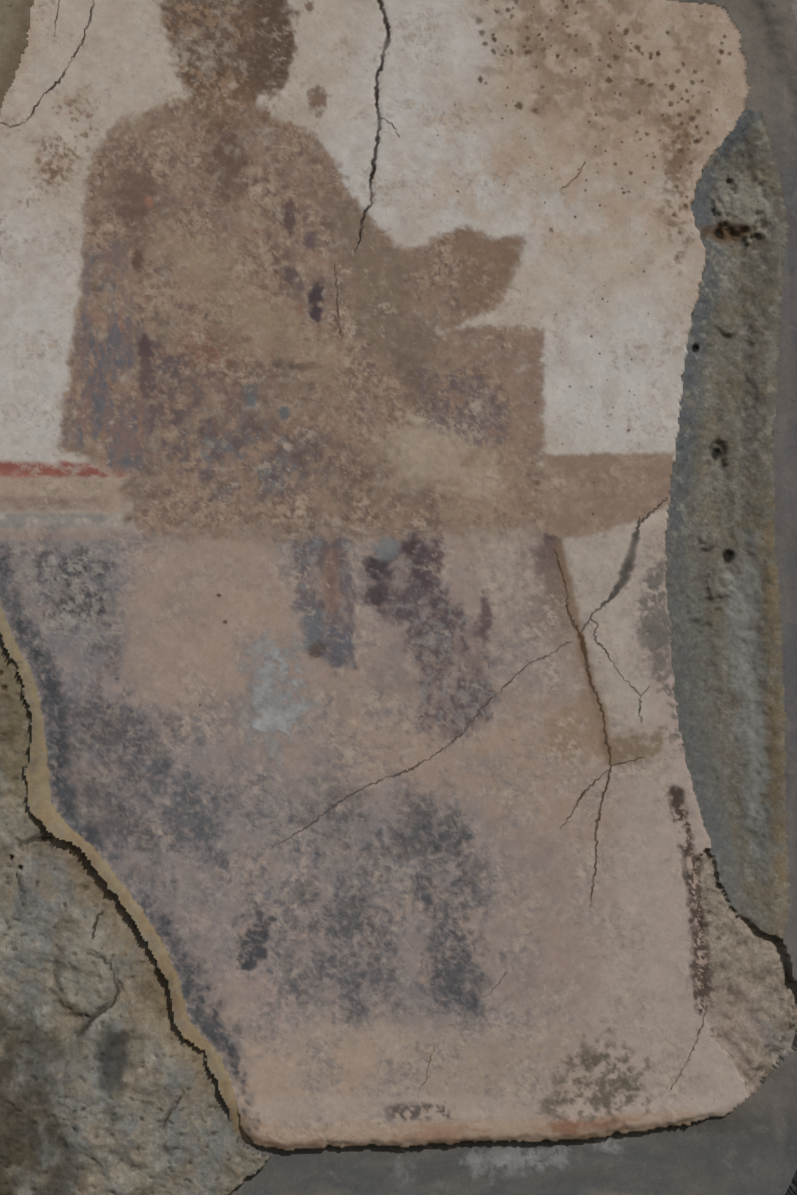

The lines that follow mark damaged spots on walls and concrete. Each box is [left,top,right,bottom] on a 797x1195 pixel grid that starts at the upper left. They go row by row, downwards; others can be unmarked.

crack [0,6,93,126]
crack [357,0,397,244]
spalling [599,29,660,95]
spalling [636,72,709,167]
crack [270,500,665,897]
spalling [639,110,797,1096]